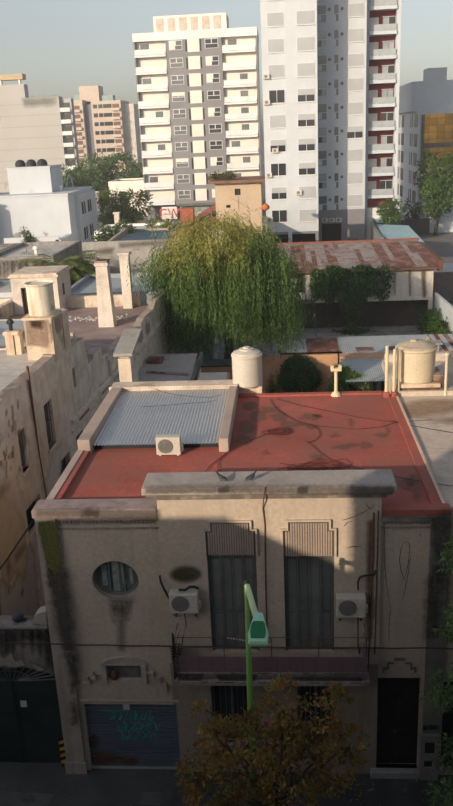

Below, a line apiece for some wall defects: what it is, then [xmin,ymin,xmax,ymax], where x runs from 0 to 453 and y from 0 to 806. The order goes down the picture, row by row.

water stain [0,573,78,693]
crack [384,530,421,634]